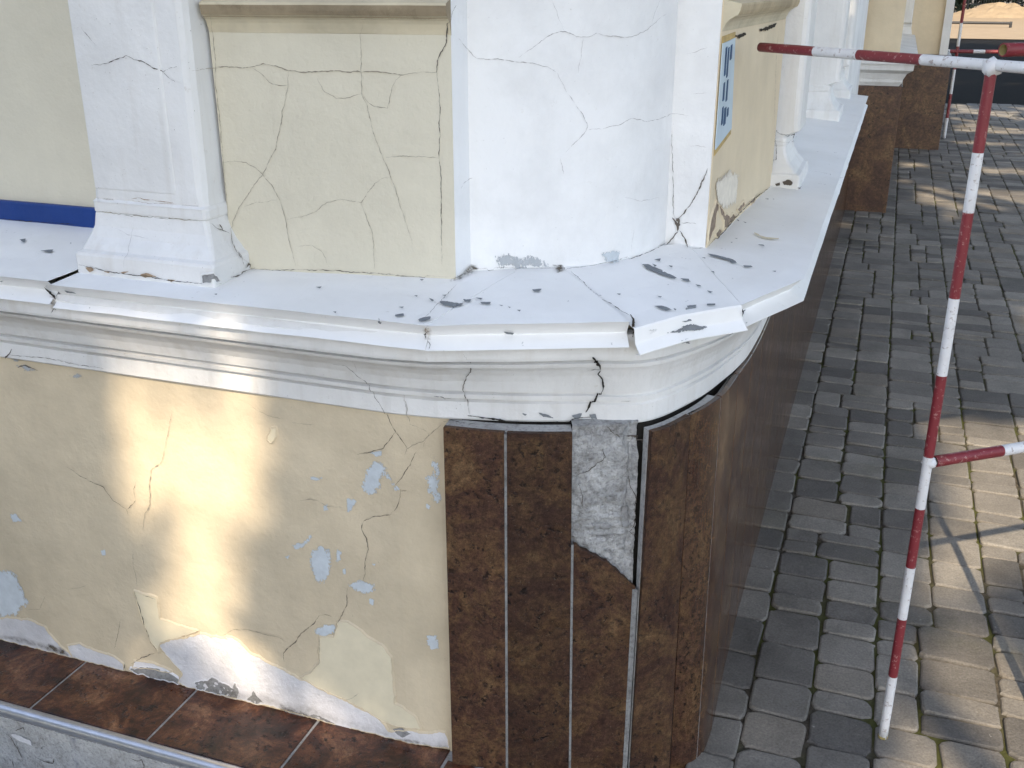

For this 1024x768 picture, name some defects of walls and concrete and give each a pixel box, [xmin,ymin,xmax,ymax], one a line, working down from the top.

crack [83,1,707,284]
flaking render [703,170,779,267]
peeling [495,253,549,269]
peeling [414,295,520,311]
peeling [642,258,715,344]
peeling [347,451,400,512]
peeling [425,461,442,510]
crack [343,356,643,568]
peeling [285,535,375,605]
flaking render [0,570,451,749]
crack [231,595,347,669]